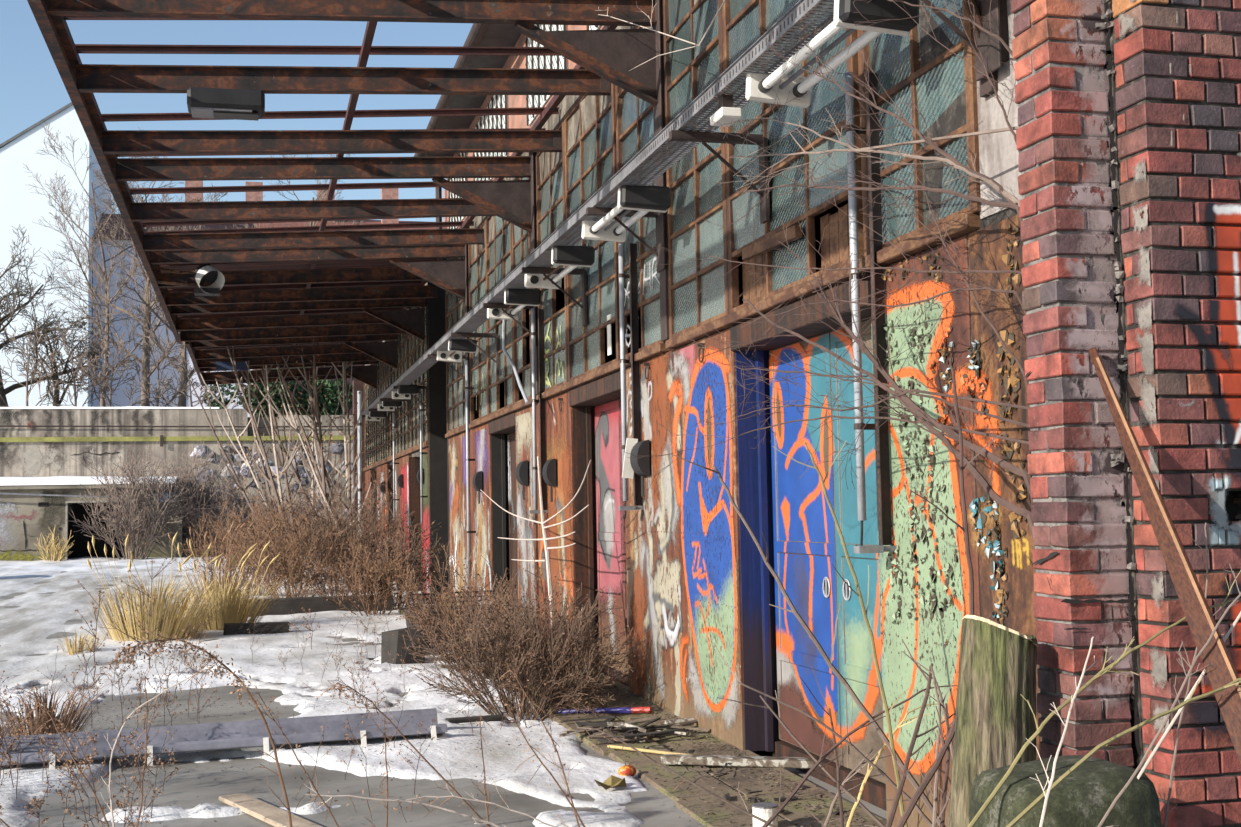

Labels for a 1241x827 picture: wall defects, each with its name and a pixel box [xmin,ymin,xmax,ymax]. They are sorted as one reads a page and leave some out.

peeling [1002,223,1021,298]
leakage [0,406,74,464]
leakage [82,409,153,465]
peeling [884,317,1027,625]
spalling [1209,491,1241,528]